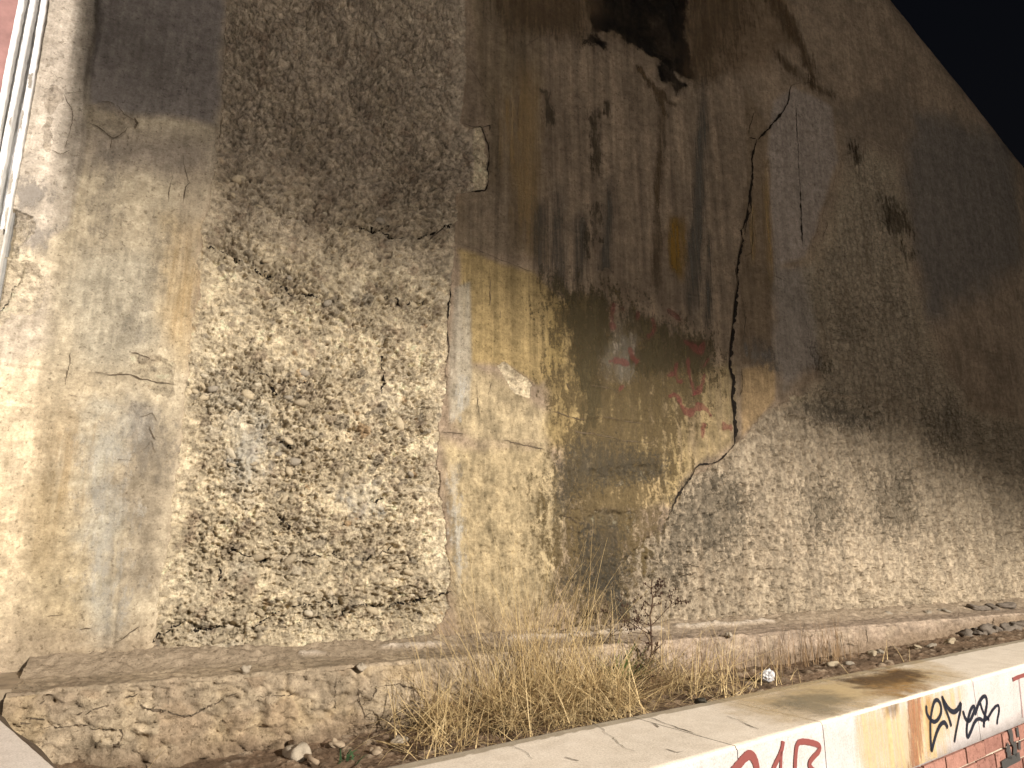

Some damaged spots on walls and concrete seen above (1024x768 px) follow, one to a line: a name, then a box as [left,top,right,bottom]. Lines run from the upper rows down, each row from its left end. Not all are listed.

damp [636,0,745,117]
crack [51,91,138,154]
damp [877,196,919,264]
crack [98,352,171,384]
spalling [130,0,488,649]
damp [513,102,728,627]
crack [666,82,828,523]
spalling [616,139,1024,624]
damp [839,670,921,685]